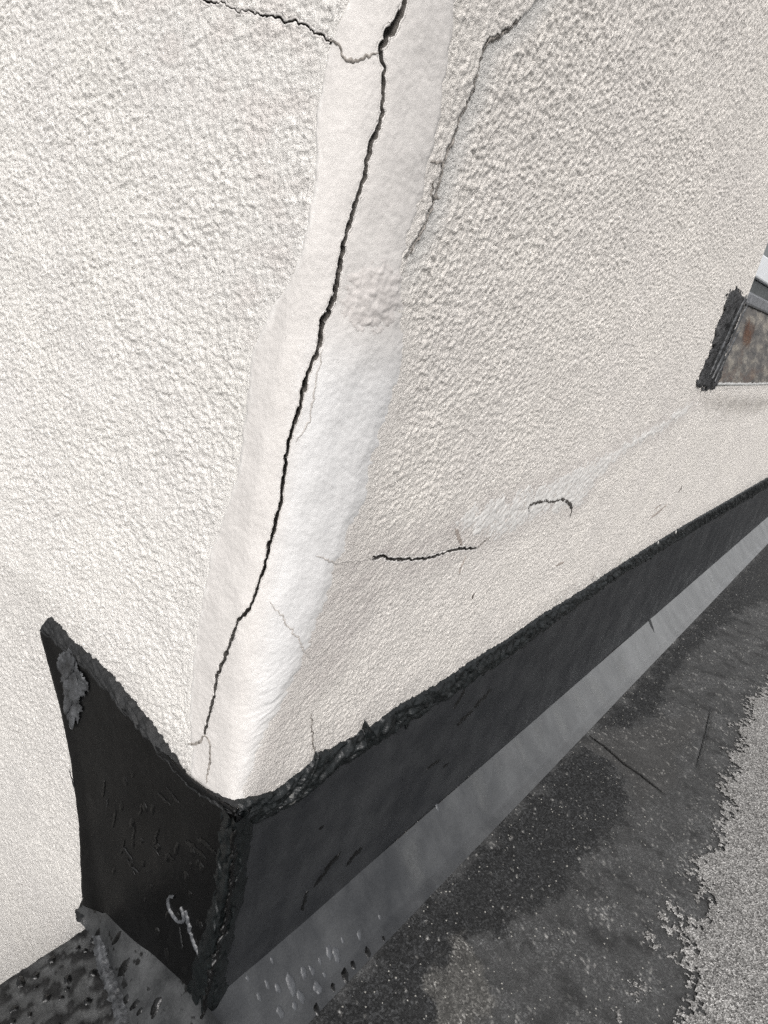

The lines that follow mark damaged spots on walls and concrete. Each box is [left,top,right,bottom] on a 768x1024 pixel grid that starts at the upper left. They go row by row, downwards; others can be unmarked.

crack [406,21,518,260]
crack [187,0,409,783]
crack [316,537,489,564]
crack [528,497,573,516]